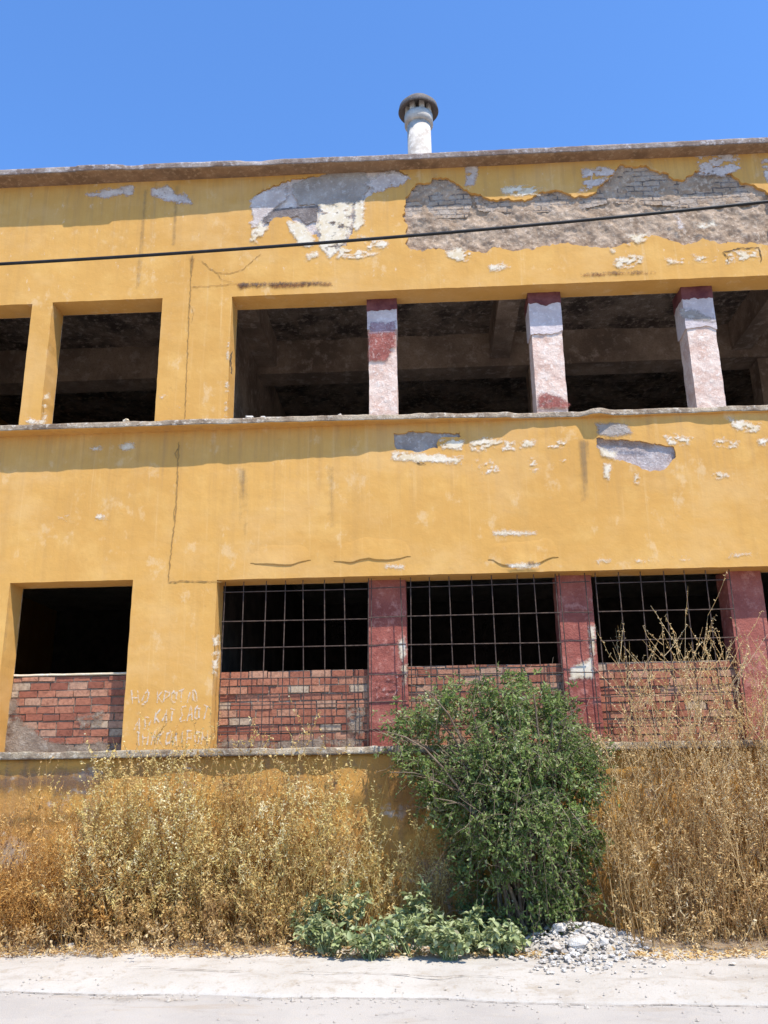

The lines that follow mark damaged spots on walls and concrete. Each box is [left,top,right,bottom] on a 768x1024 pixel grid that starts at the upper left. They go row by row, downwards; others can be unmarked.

peeling [85,185,134,198]
peeling [151,185,193,204]
spalling [249,154,768,274]
crack [168,254,261,583]
peeling [728,417,768,444]
spalling [391,432,534,473]
spalling [596,423,689,483]